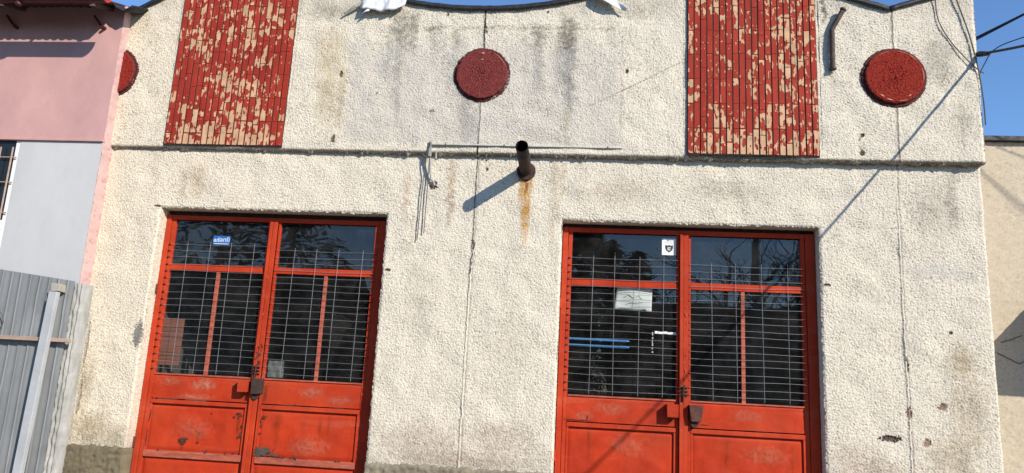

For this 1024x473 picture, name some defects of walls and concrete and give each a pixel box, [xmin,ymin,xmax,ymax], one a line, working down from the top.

peeling [164,0,296,145]
crack [481,10,489,48]
spalling [688,0,819,160]
crack [469,103,481,310]
corrosion [520,180,529,229]
crack [894,108,902,201]